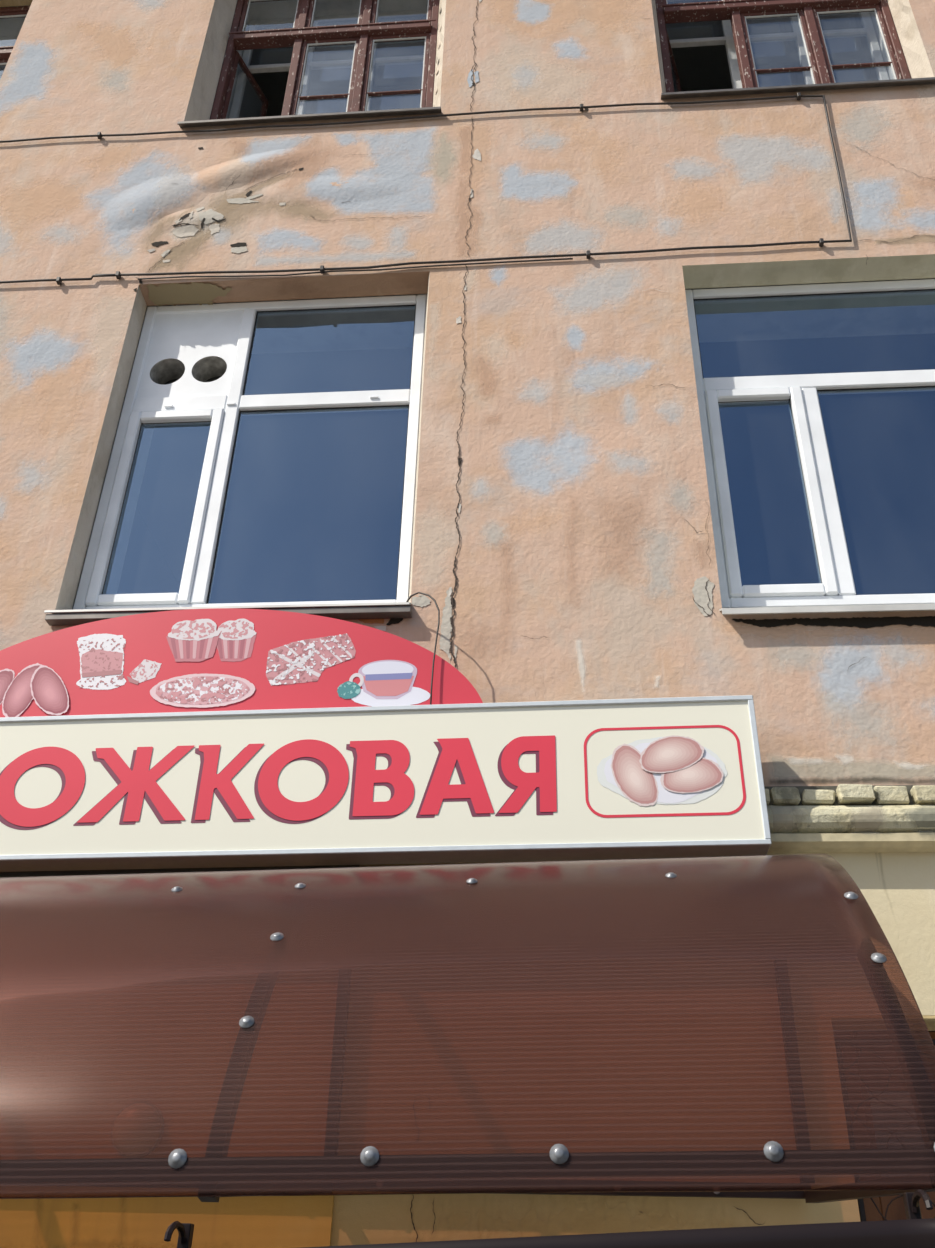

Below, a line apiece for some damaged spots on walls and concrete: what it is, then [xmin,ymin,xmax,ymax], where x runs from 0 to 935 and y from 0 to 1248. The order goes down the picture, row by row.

peeling [93,156,188,245]
peeling [243,137,307,162]
peeling [147,190,413,265]
peeling [299,129,434,212]
crack [450,2,478,668]
flaking render [732,616,935,628]
peeling [821,640,913,708]
crack [410,1194,435,1242]